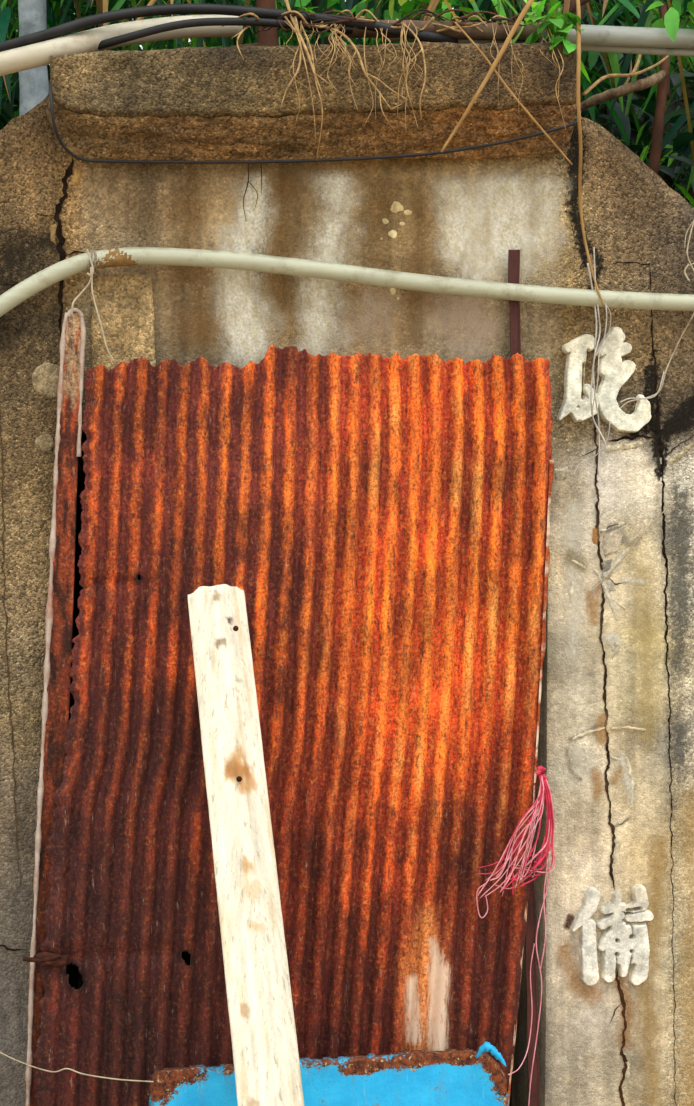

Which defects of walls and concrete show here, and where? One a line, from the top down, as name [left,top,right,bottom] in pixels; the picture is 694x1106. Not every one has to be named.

crack [38,157,84,338]
leakage [627,345,694,481]
leakage [666,487,694,671]
crack [580,262,694,1106]
leakage [671,723,689,779]